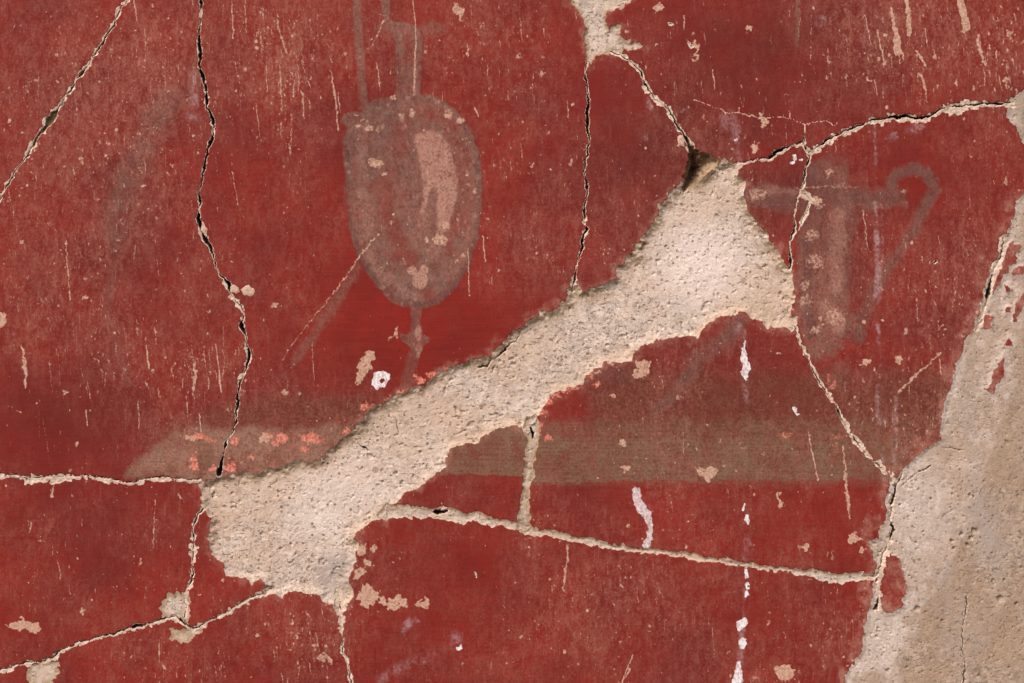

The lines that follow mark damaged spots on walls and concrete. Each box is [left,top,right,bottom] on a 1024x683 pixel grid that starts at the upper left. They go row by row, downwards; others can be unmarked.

spalling [571,0,643,64]
spalling [1006,90,1024,144]
crack [570,50,1016,295]
crack [973,235,1005,332]
crack [0,0,275,673]
spalling [182,158,801,616]
peeling [821,423,865,463]
crack [793,324,964,613]
spalling [844,194,1024,683]
spalling [159,591,203,644]
crack [334,588,353,683]